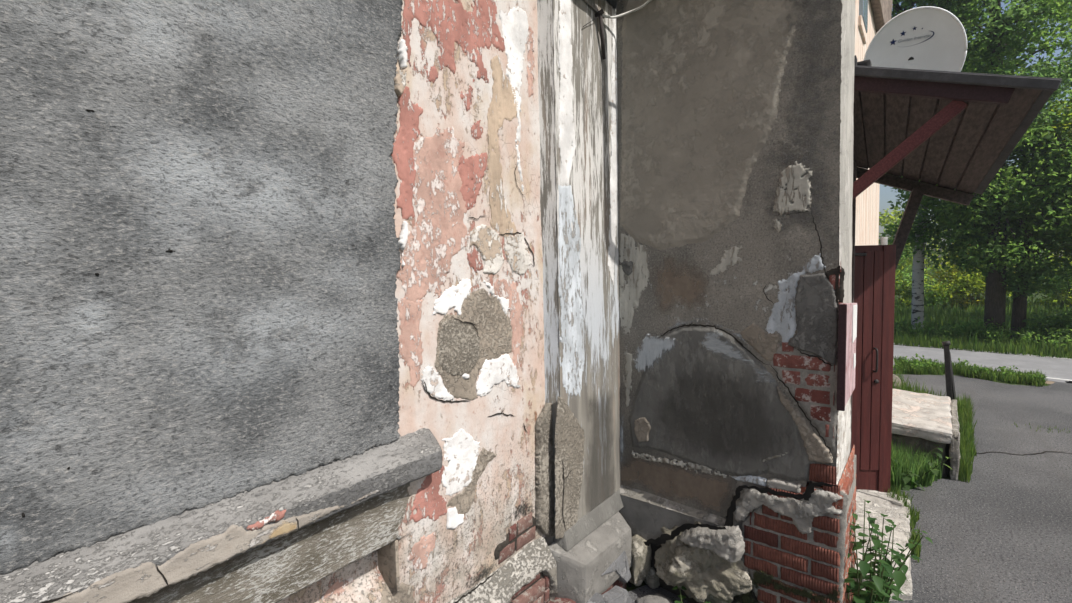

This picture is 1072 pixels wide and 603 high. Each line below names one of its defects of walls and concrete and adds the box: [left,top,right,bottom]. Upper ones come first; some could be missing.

peeling [391,0,535,401]
flaking render [825,261,845,304]
spalling [50,490,380,603]
spalling [381,582,417,603]
spalling [407,447,497,571]
crack [454,569,499,603]
flaking render [509,571,550,603]
spalling [494,396,585,564]
crack [643,323,838,546]
flaking render [741,323,851,485]